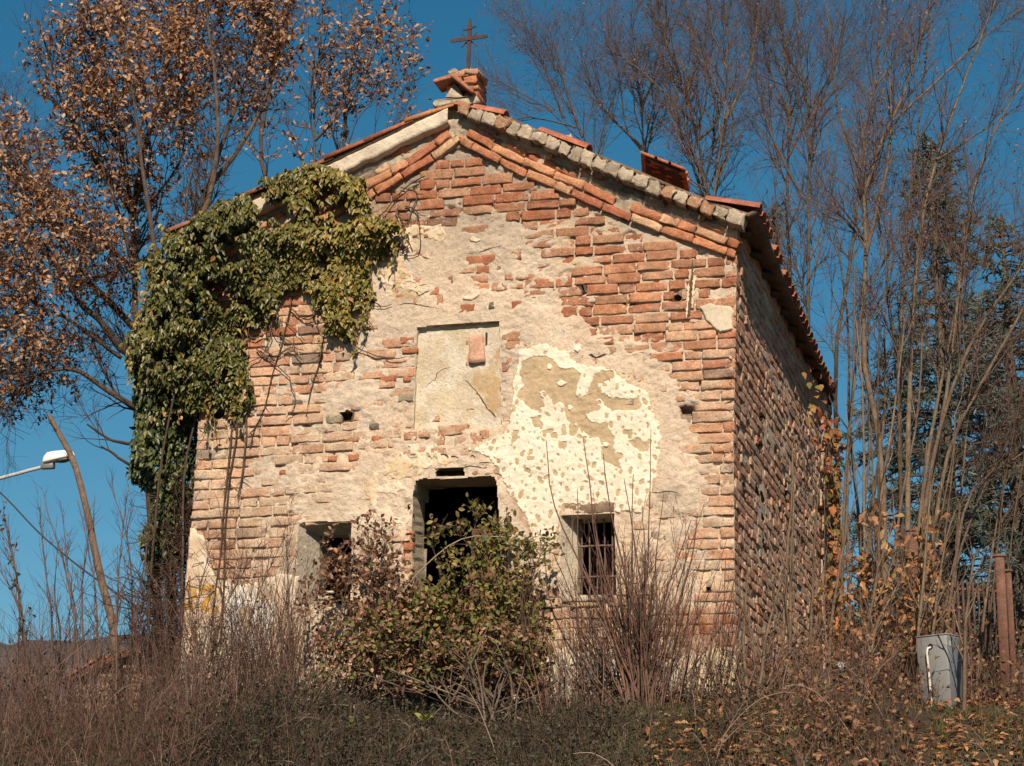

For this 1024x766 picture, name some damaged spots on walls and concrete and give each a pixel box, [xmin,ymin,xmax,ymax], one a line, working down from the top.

crack [425,368,496,417]
peeling [358,443,452,536]
peeling [468,344,662,556]